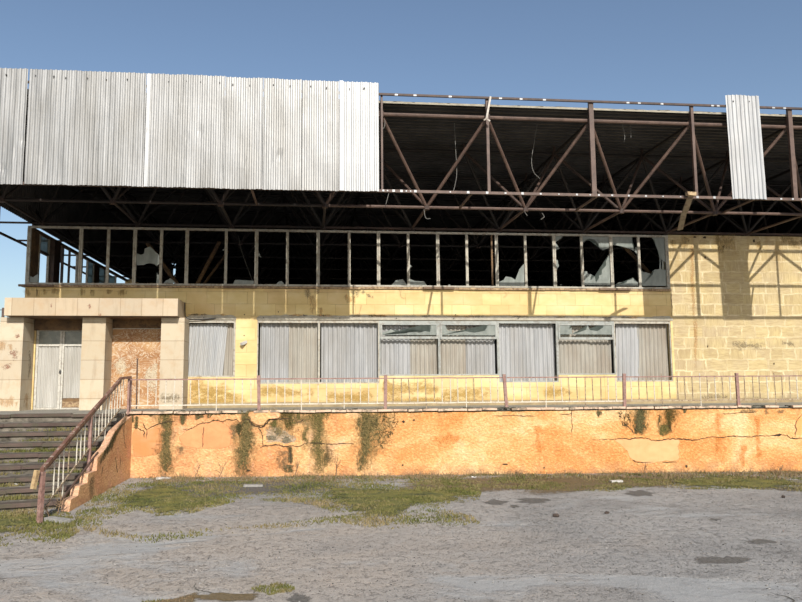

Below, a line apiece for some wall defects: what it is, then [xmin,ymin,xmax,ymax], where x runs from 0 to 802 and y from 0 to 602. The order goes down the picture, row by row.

crack [102,413,353,472]
crack [592,411,802,441]